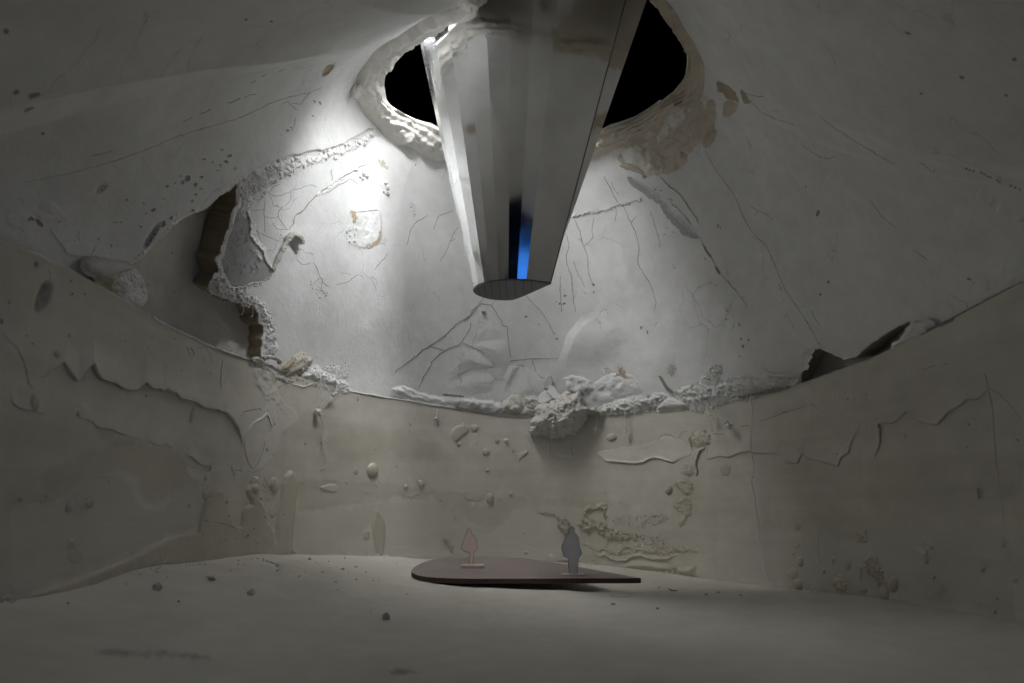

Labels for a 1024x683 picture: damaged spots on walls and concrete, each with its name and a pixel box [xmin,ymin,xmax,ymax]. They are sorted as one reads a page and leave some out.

peeling [202,100,383,394]
crack [297,210,458,293]
crack [526,176,661,332]
peeling [42,334,244,448]
spalling [391,385,502,413]
crack [394,298,558,388]
spalling [538,364,766,420]
spalling [797,349,814,372]
peeling [539,429,712,542]